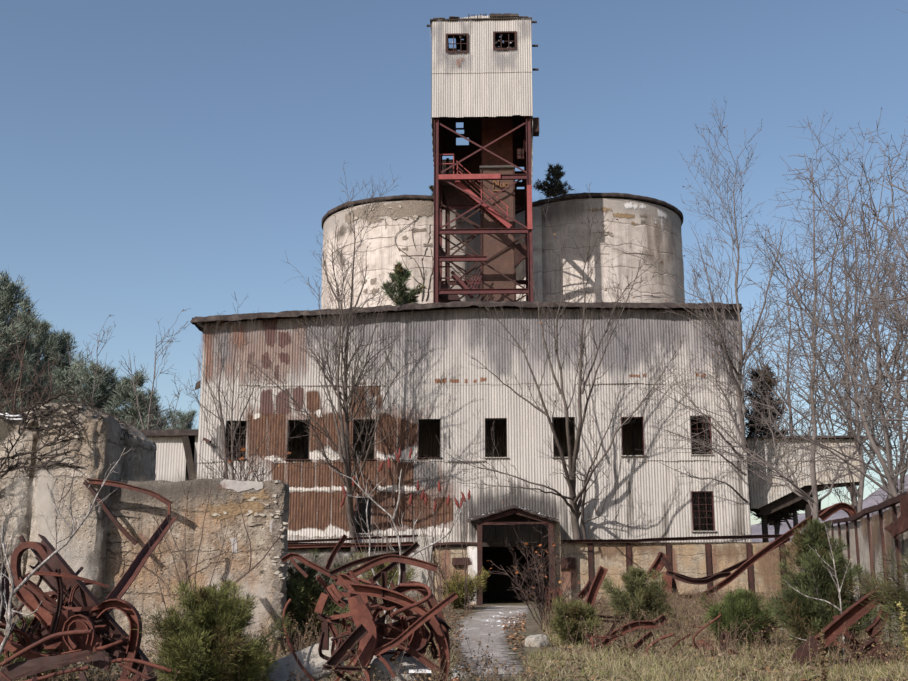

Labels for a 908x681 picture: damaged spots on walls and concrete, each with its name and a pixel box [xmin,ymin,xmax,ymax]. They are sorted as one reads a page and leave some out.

spalling [588,207,647,225]
leakage [471,314,521,372]
leakage [532,310,582,365]
leakage [593,314,646,370]
leakage [656,316,679,344]
corrosion [203,318,472,532]
peeling [309,445,340,461]
peeling [377,485,419,493]
spalling [206,480,350,637]
peeling [374,526,450,537]
leakage [599,525,629,557]
leakage [759,541,798,593]